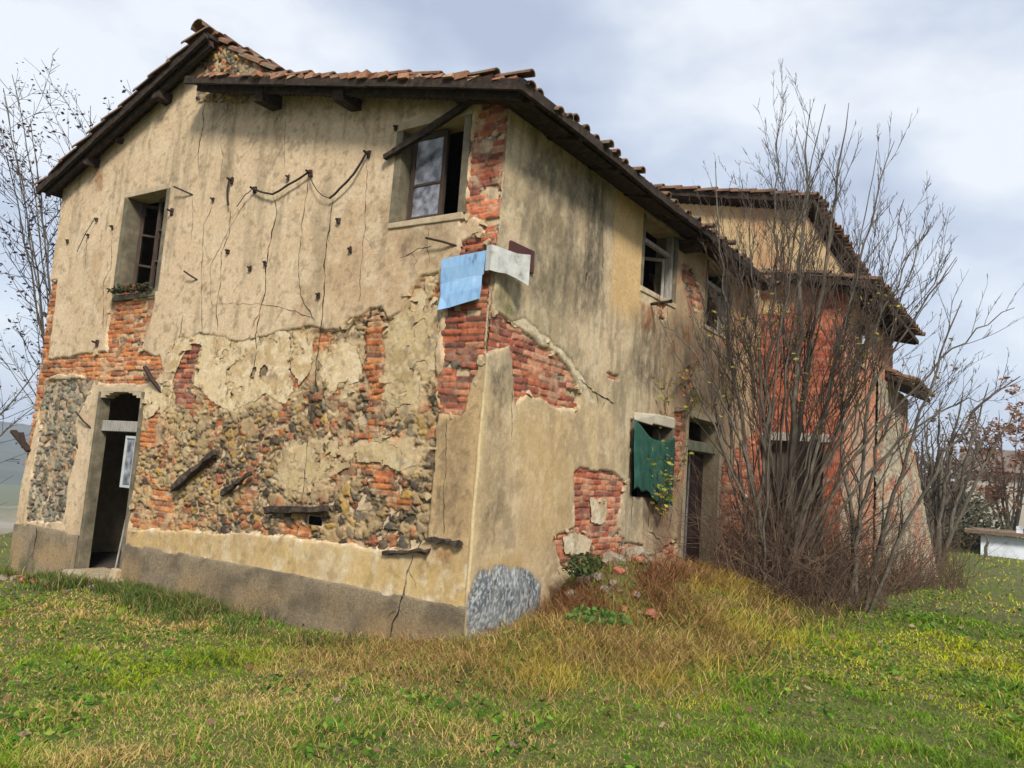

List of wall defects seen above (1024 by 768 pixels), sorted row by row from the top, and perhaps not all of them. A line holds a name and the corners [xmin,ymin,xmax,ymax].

crack [166,184,333,390]
spalling [24,104,594,551]
crack [389,554,417,637]
spalling [553,468,643,574]